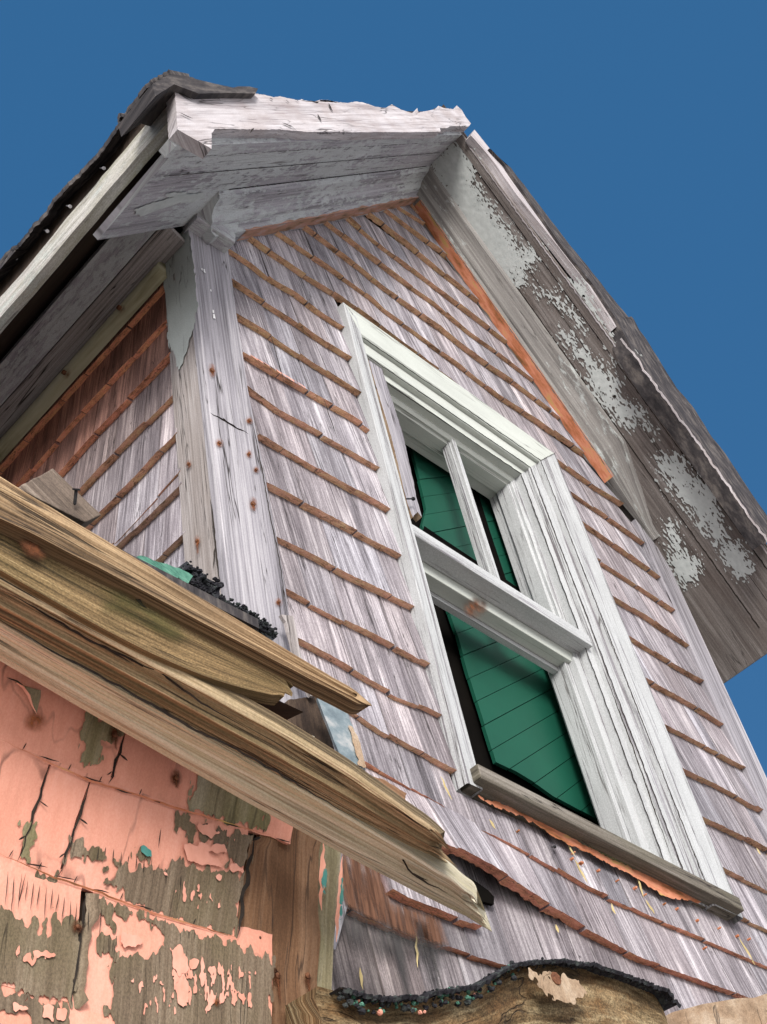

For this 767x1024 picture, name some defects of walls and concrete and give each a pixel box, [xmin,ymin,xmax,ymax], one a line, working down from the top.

peeling [163,231,206,370]
peeling [430,141,756,592]
crack [210,411,287,615]
peeling [9,678,41,714]
peeling [78,711,124,768]
crack [0,590,359,821]
peeling [0,905,86,1024]
crack [3,737,289,1009]
peeling [18,775,276,1024]
crack [402,859,447,893]
peeling [478,795,701,903]